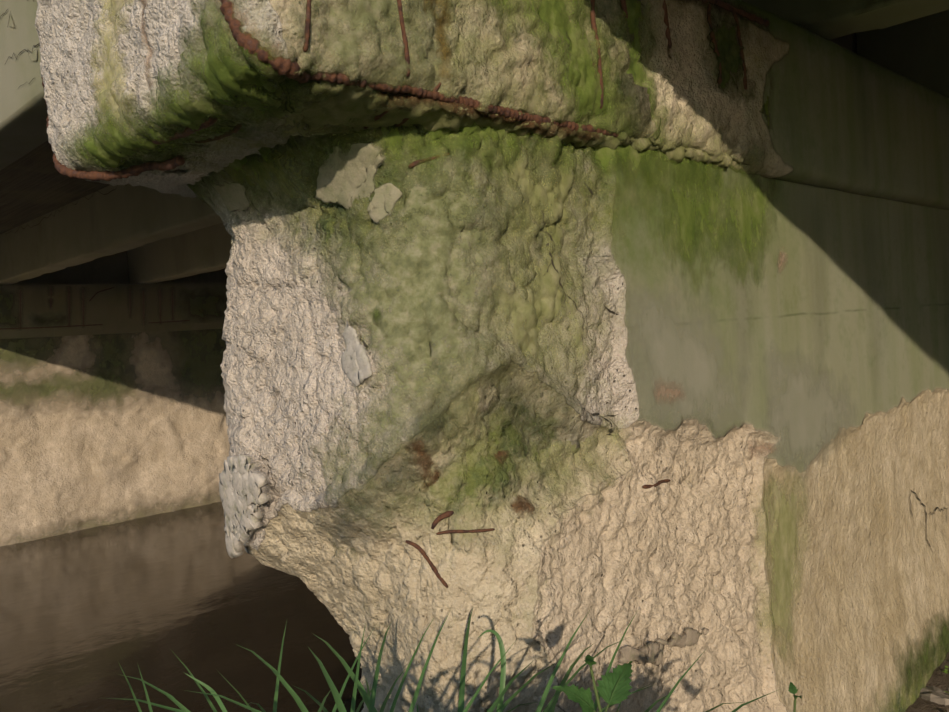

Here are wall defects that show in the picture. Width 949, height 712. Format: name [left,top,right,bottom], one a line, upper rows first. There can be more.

spalling [35,0,262,172]
corrosion [381,91,599,142]
spalling [232,0,793,179]
spalling [0,104,639,553]
corrosion [412,441,439,487]
corrosion [511,496,534,512]
spalling [246,361,949,712]